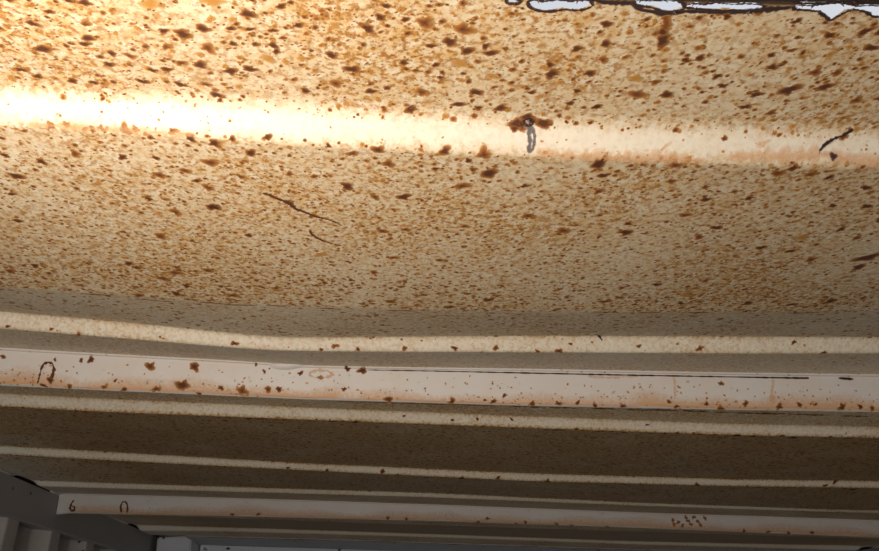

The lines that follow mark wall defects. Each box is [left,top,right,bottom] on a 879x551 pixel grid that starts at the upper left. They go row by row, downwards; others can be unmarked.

rust [570,0,879,51]
rust [159,24,215,87]
rust [222,41,279,76]
rust [441,22,499,67]
rust [403,88,428,114]
rust [626,75,673,99]
rust [776,67,843,96]
rust [507,113,553,133]
crack [819,128,854,153]
rust [465,144,498,178]
crack [262,193,342,246]
rust [85,362,348,402]